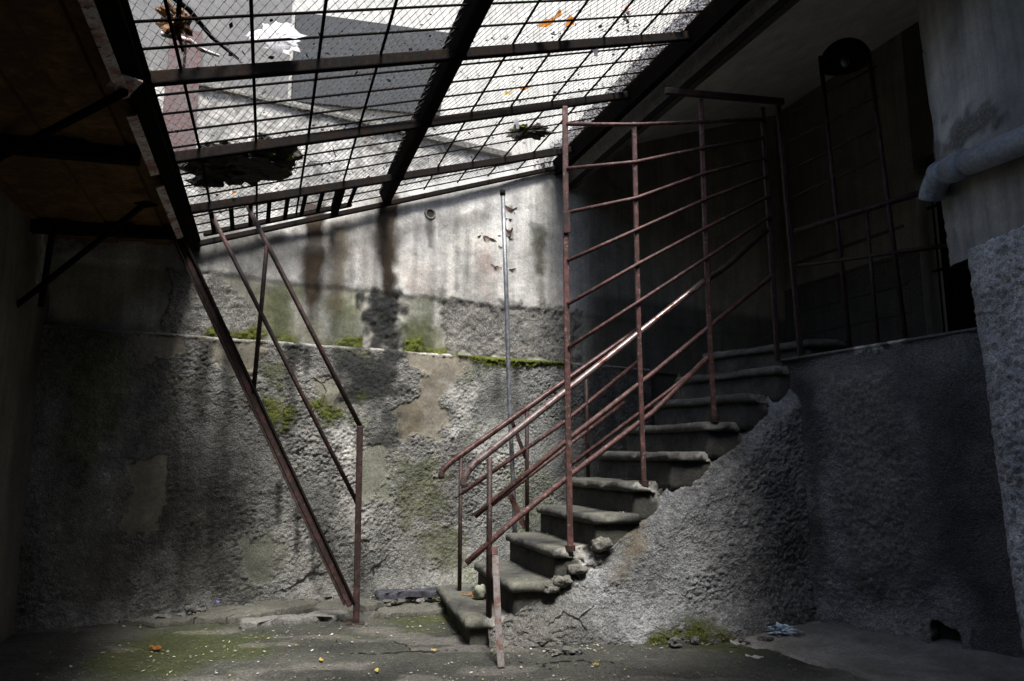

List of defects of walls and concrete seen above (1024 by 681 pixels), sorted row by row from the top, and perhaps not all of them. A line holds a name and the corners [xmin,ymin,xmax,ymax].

crack [548,605,594,630]